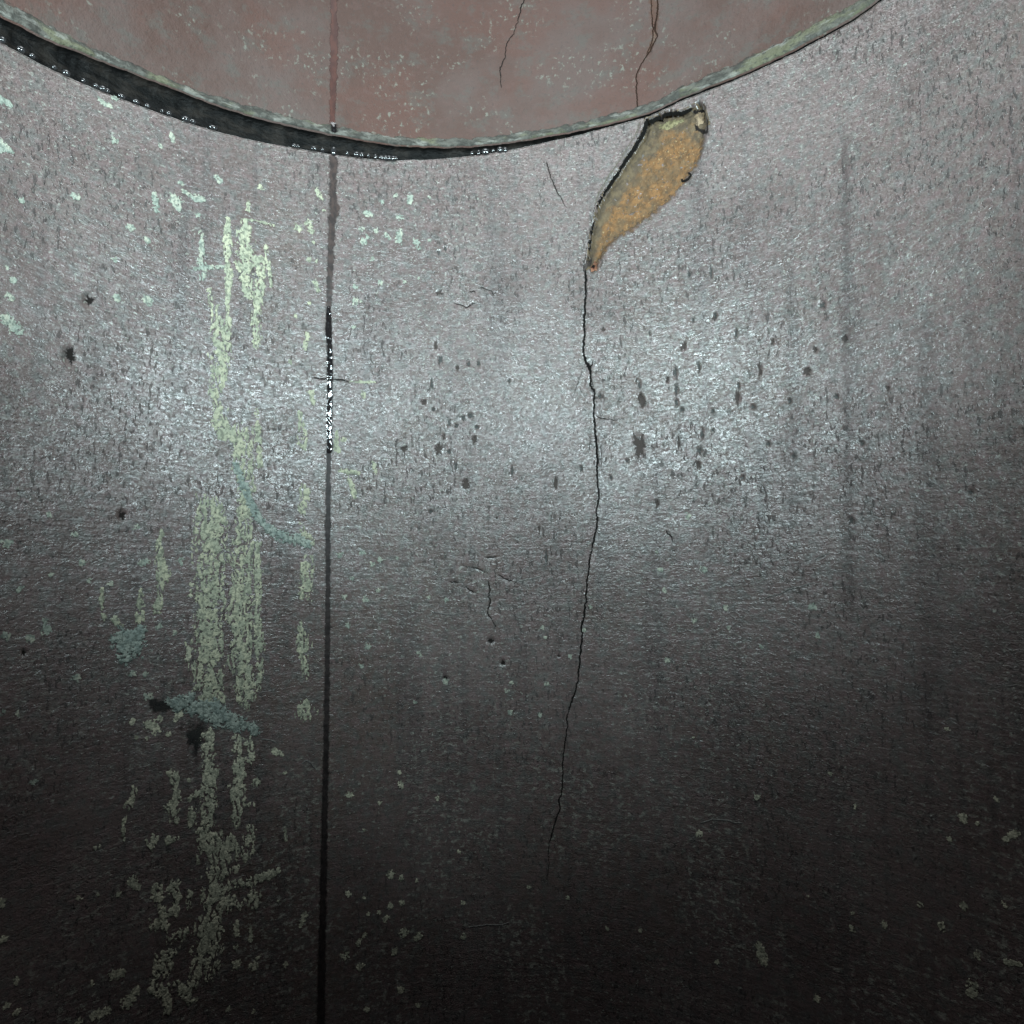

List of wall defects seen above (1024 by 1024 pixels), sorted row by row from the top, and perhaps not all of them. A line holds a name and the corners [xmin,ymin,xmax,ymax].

crack [499,0,524,87]
crack [635,0,659,107]
spalling [583,103,710,272]
leakage [184,216,275,710]
leakage [98,529,172,627]
crack [547,266,622,875]
leakage [149,698,171,712]
leakage [121,785,138,841]
leakage [145,720,281,1016]